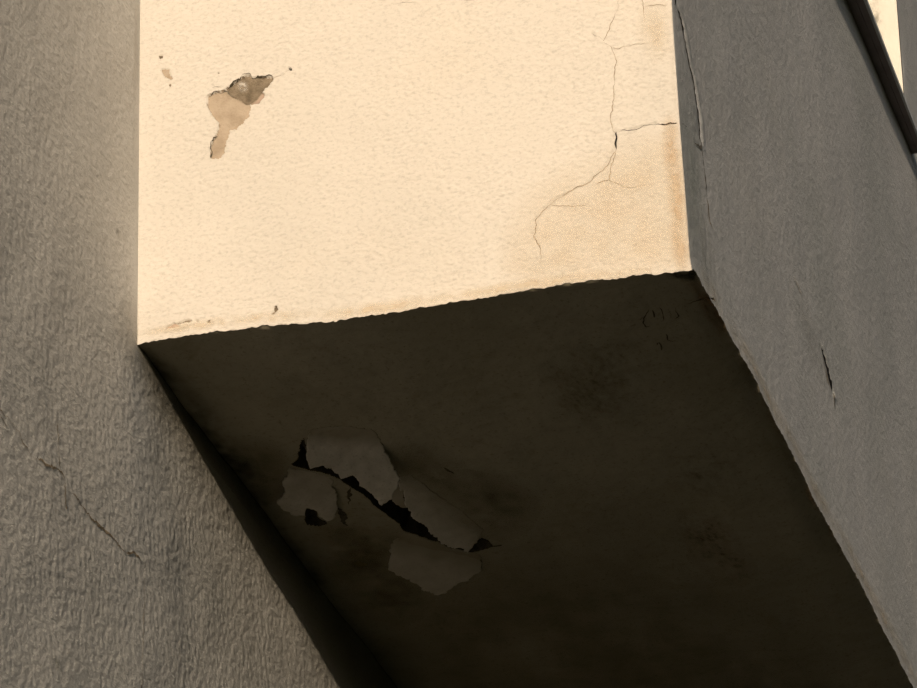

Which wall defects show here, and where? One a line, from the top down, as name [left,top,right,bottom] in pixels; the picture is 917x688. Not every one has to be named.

peeling [207,68,292,159]
crack [533,0,713,260]
crack [821,348,835,406]
crack [0,410,145,607]
peeling [277,426,502,595]